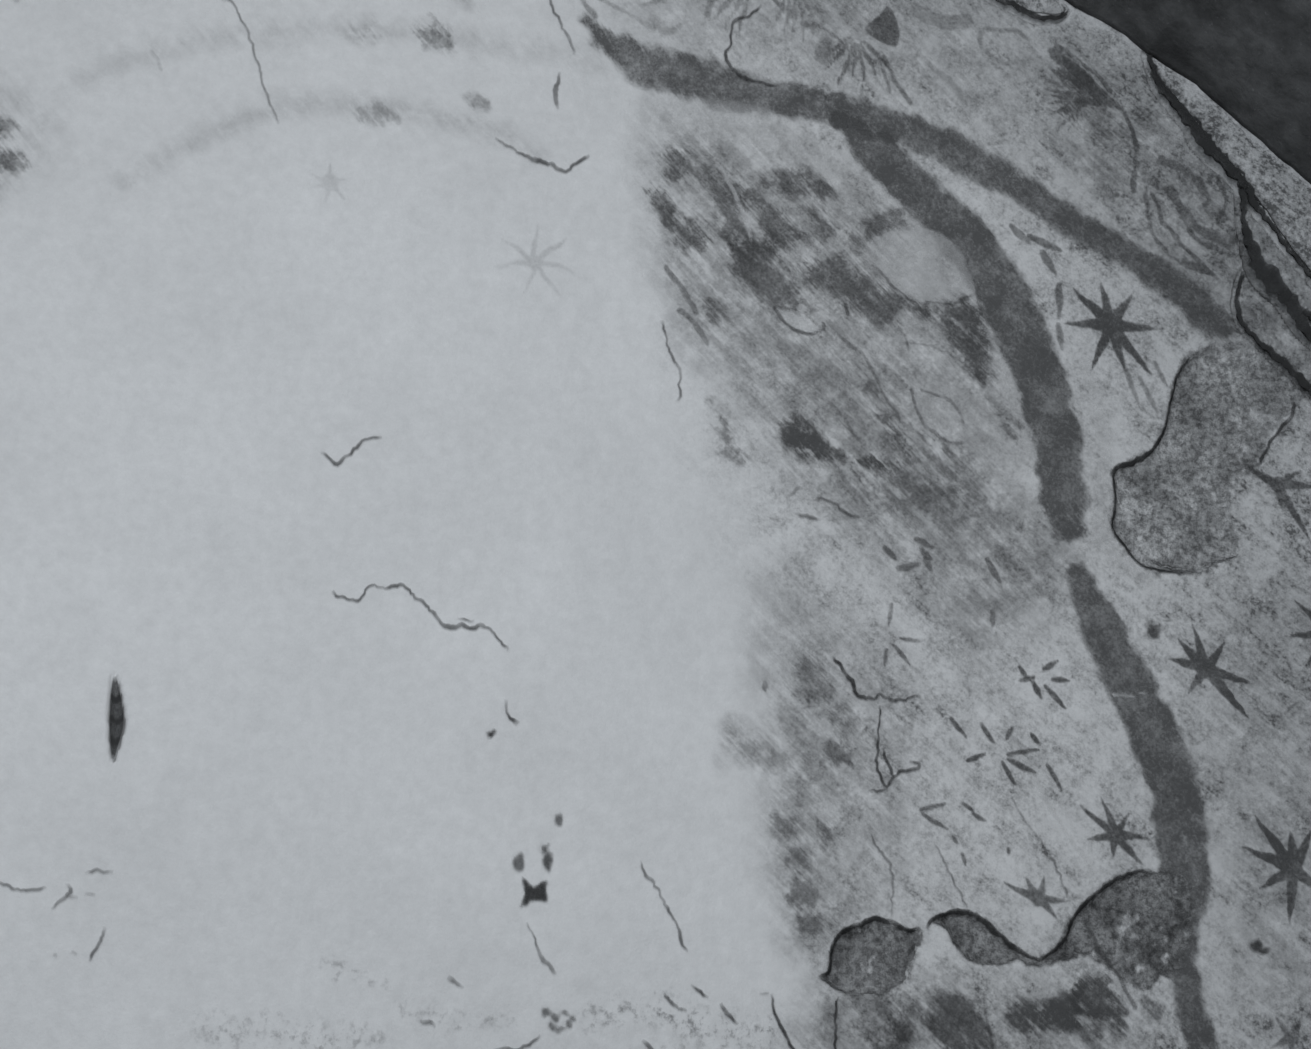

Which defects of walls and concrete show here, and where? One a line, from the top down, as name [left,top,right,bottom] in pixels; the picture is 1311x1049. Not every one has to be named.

peeling [1005,0,1069,16]
crack [519,152,585,172]
peeling [1155,64,1311,272]
crack [326,436,377,465]
flaking render [1109,343,1305,575]
crack [335,583,506,646]
flaking render [819,869,1194,995]